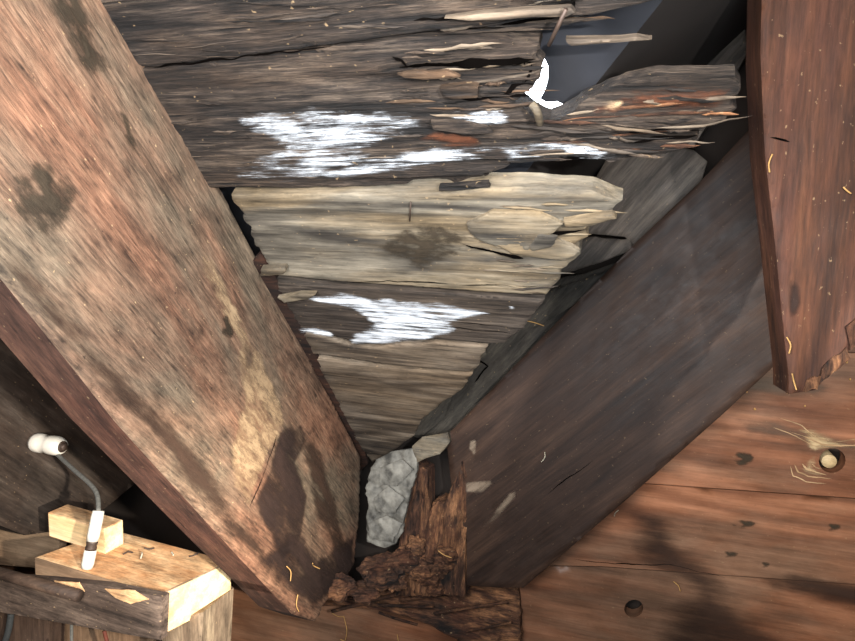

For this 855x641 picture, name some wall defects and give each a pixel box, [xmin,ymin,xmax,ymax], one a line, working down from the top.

damp [52,0,105,70]
crack [154,46,330,68]
damp [120,113,135,149]
damp [243,113,472,176]
peeling [431,119,493,134]
damp [455,113,505,124]
damp [539,144,603,155]
peeling [528,234,557,251]
damp [17,271,73,332]
damp [311,296,481,343]
damp [95,365,353,602]